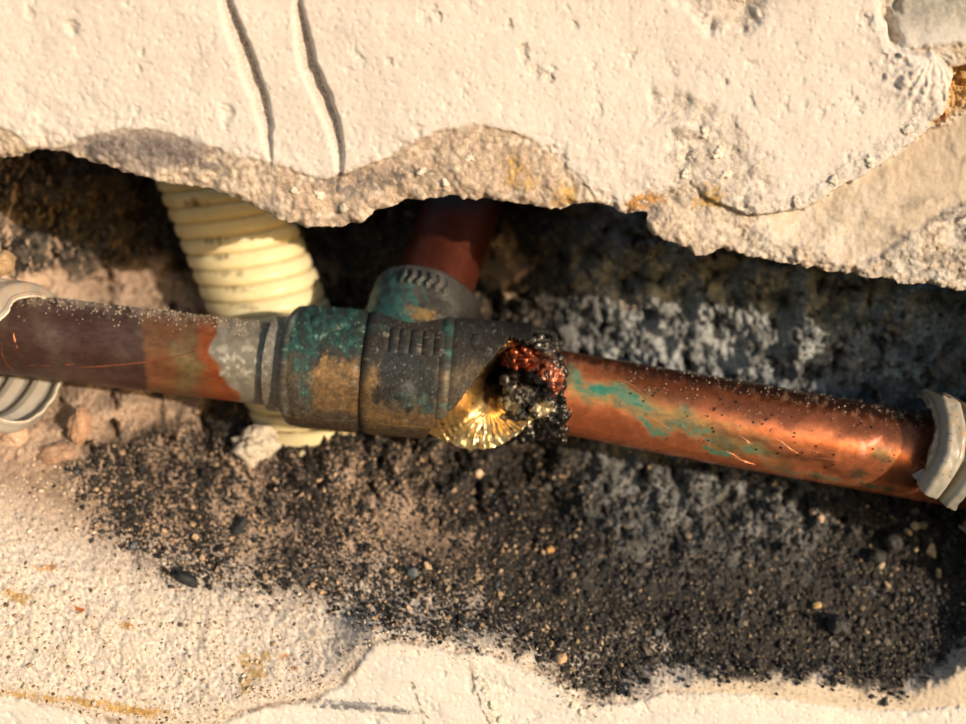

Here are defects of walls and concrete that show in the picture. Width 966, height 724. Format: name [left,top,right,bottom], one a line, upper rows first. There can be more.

flaking render [689,0,765,32]
flaking render [656,94,948,216]
flaking render [276,127,563,223]
spalling [926,543,941,578]
leakage [320,699,410,714]